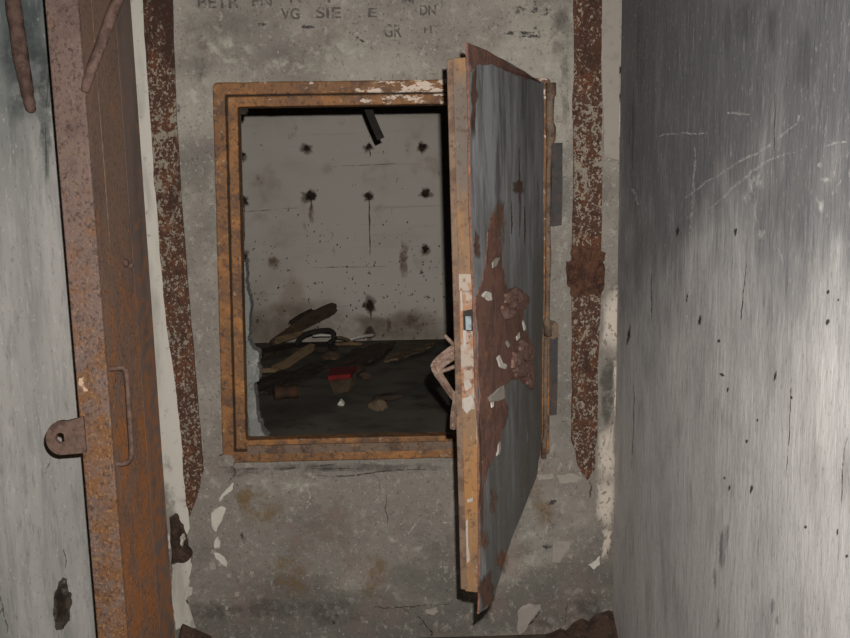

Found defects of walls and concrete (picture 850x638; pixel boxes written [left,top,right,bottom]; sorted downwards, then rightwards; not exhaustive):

spalling [244,260,270,436]
rust [474,150,537,548]
peeling [209,483,234,578]
rust [479,574,494,608]